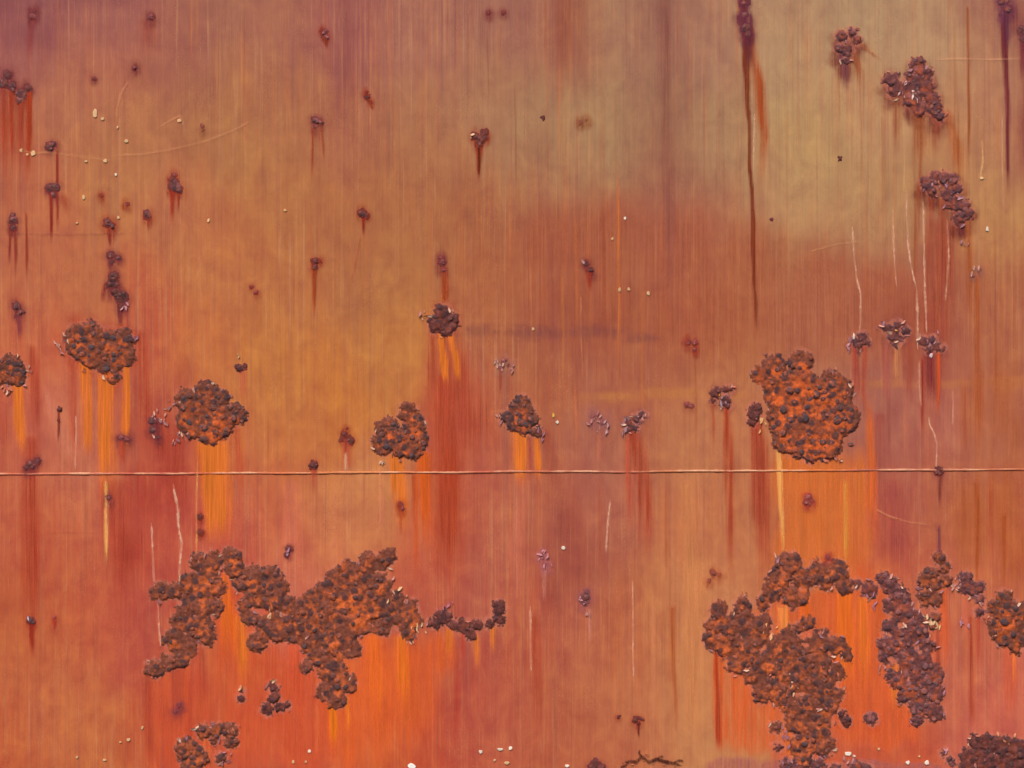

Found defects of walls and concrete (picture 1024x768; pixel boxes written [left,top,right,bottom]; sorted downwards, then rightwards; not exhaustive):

corrosion [0,69,33,156]
corrosion [737,0,767,307]
corrosion [832,26,873,79]
corrosion [880,9,982,407]
corrosion [0,213,139,598]
corrosion [145,379,249,537]
corrosion [370,255,481,550]
corrosion [495,394,548,475]
corrosion [745,281,948,537]
corrosion [174,721,241,768]
corrosion [143,545,506,740]
corrosion [701,490,1024,768]